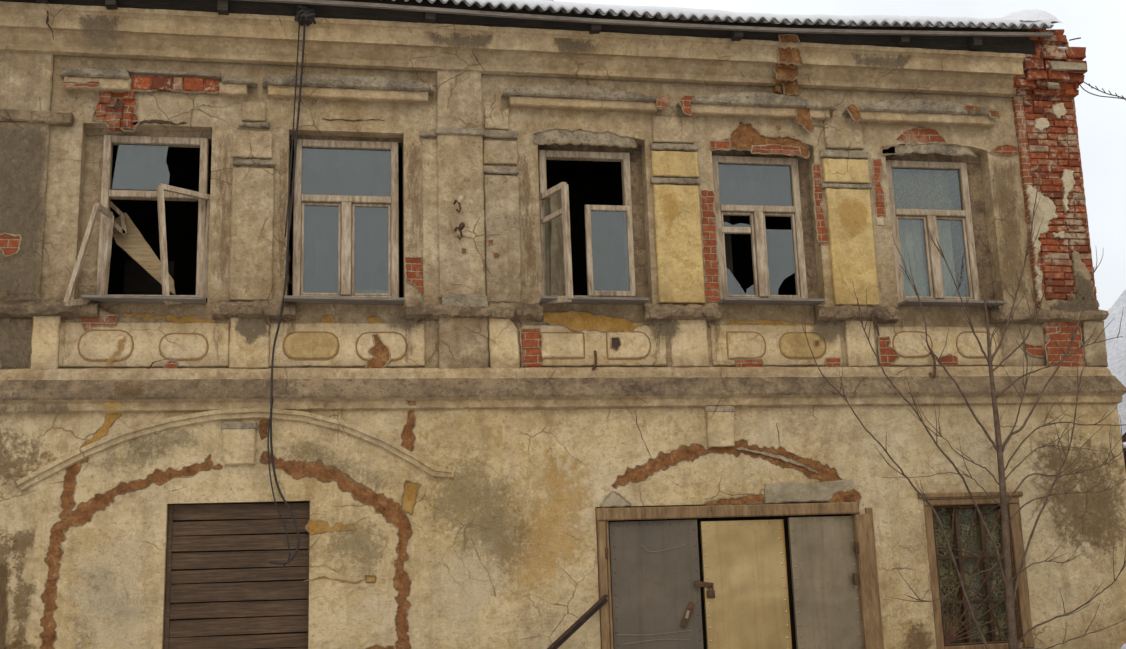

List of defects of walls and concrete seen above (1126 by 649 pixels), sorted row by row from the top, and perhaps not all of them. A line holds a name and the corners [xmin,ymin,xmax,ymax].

flaking render [0,232,22,257]
flaking render [61,73,220,132]
flaking render [700,189,721,303]
flaking render [709,34,829,244]
flaking render [872,29,1100,367]
water stain [0,529,35,649]